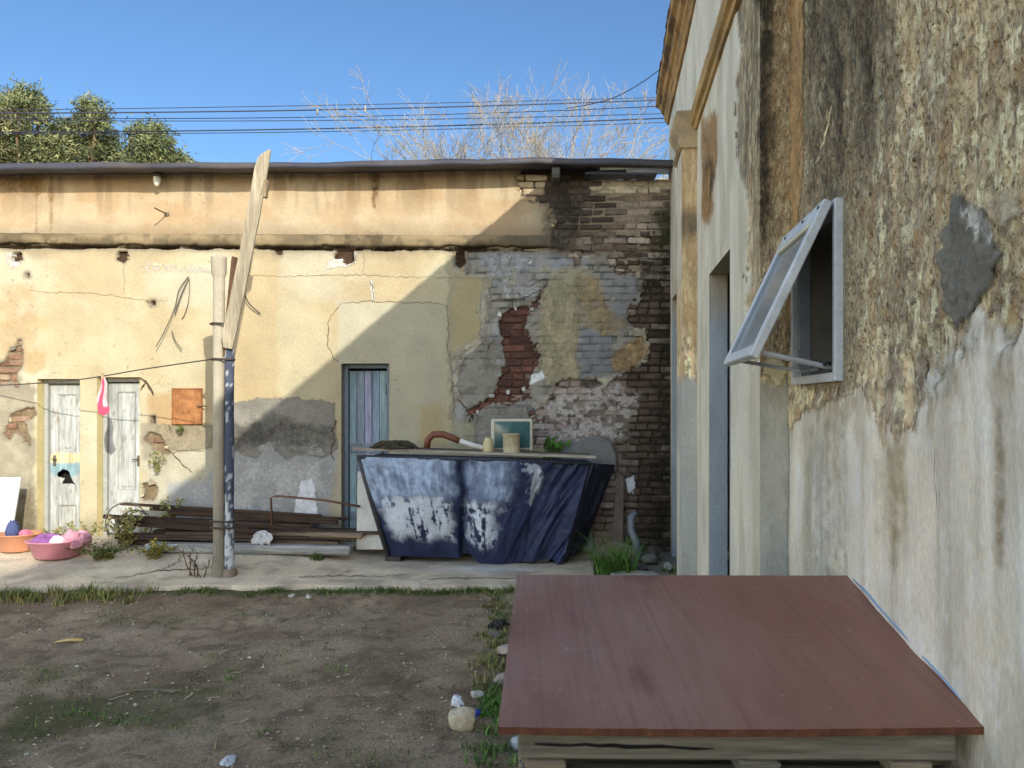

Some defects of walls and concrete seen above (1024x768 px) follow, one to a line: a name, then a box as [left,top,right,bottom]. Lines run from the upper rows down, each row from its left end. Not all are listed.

water stain [754,0,775,216]
water stain [701,112,717,223]
spalling [326,247,357,269]
spalling [0,341,24,387]
spalling [4,407,37,445]
spalling [145,416,170,457]
spalling [448,174,671,551]
peeling [763,333,839,431]
peeling [853,329,977,443]
peeling [992,327,1024,362]